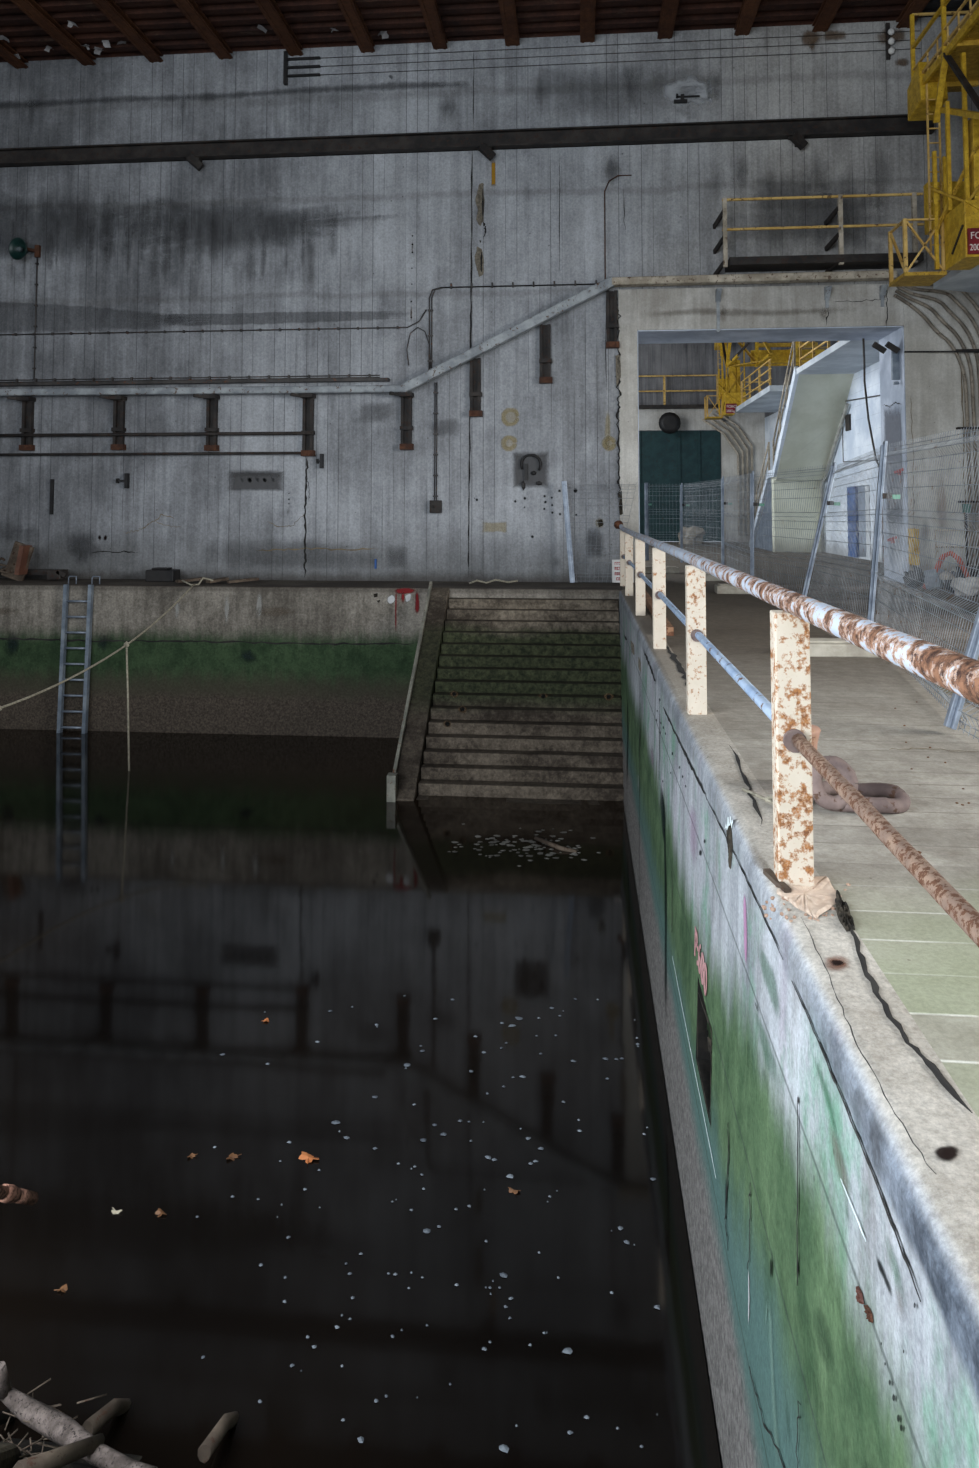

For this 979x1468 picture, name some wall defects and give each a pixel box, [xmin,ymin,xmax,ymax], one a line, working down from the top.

crack [749,1366,801,1468]